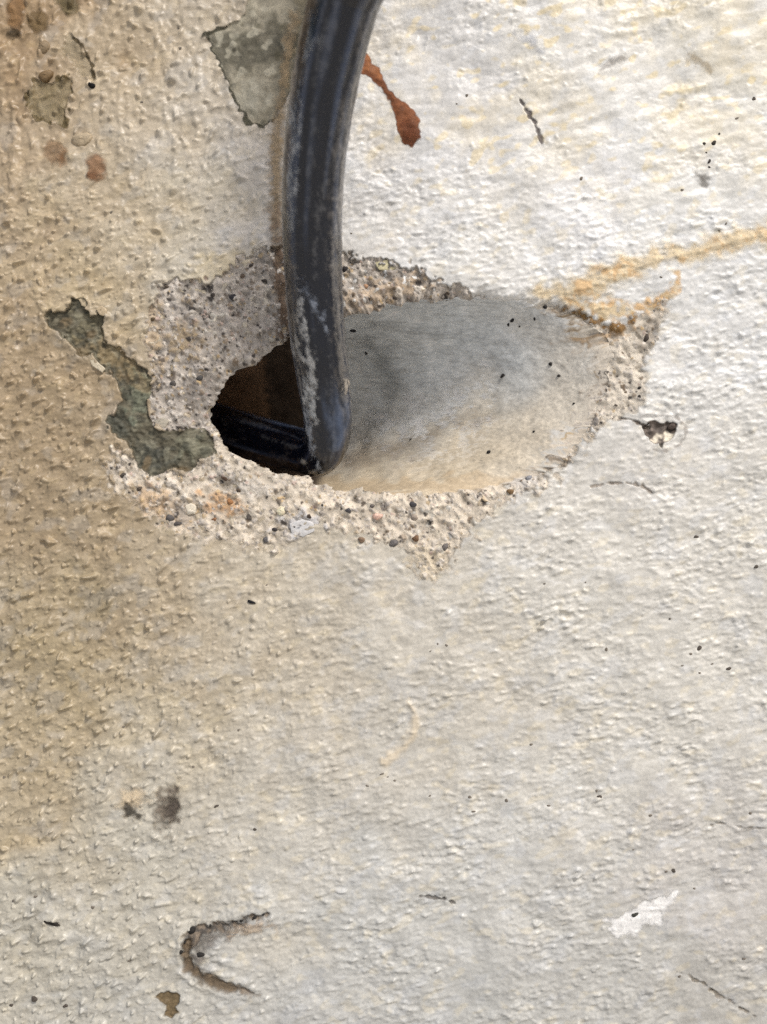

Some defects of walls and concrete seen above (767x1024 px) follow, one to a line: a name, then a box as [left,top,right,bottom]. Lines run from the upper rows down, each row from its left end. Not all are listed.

peeling [202,0,307,128]
rust [361,53,420,147]
spalling [45,241,669,582]
peeling [643,420,677,447]
crack [179,912,269,994]